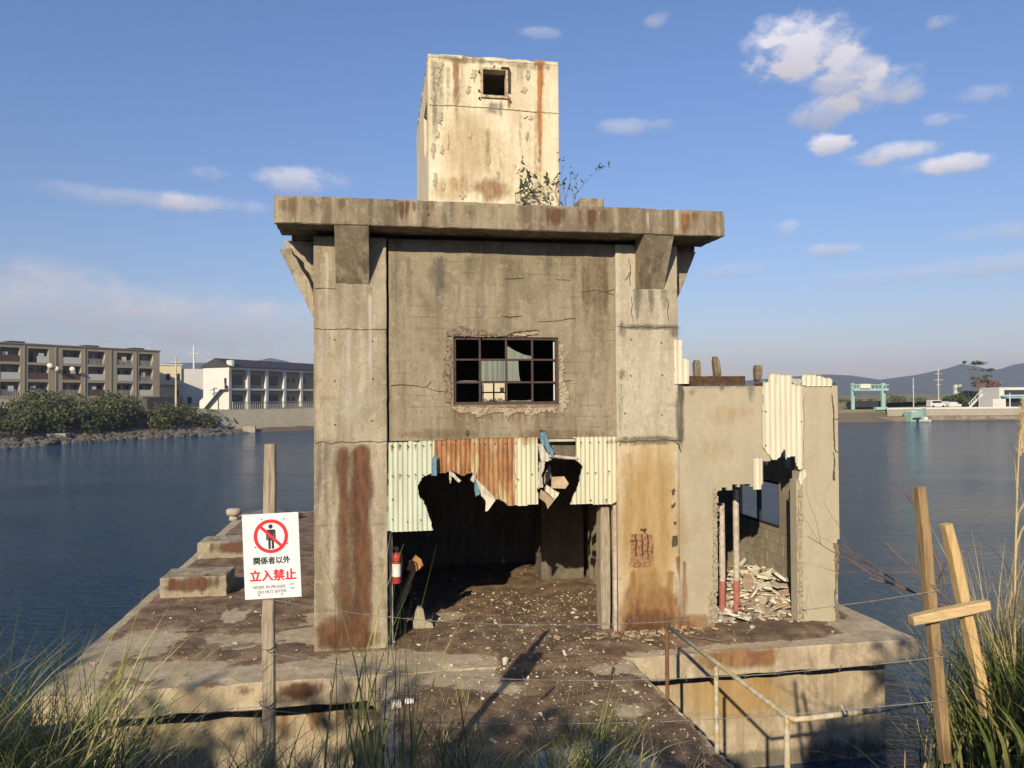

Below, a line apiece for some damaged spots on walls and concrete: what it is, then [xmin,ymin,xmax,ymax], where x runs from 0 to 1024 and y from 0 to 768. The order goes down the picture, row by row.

peeling [431,62,444,158]
corrosion [534,60,544,161]
corrosion [477,181,503,200]
corrosion [682,213,698,229]
crack [556,259,678,328]
spalling [442,326,569,418]
corrosion [166,577,218,591]
corrosion [318,445,377,650]
peeling [381,488,755,767]
corrosion [621,461,718,632]
spalling [789,486,807,626]